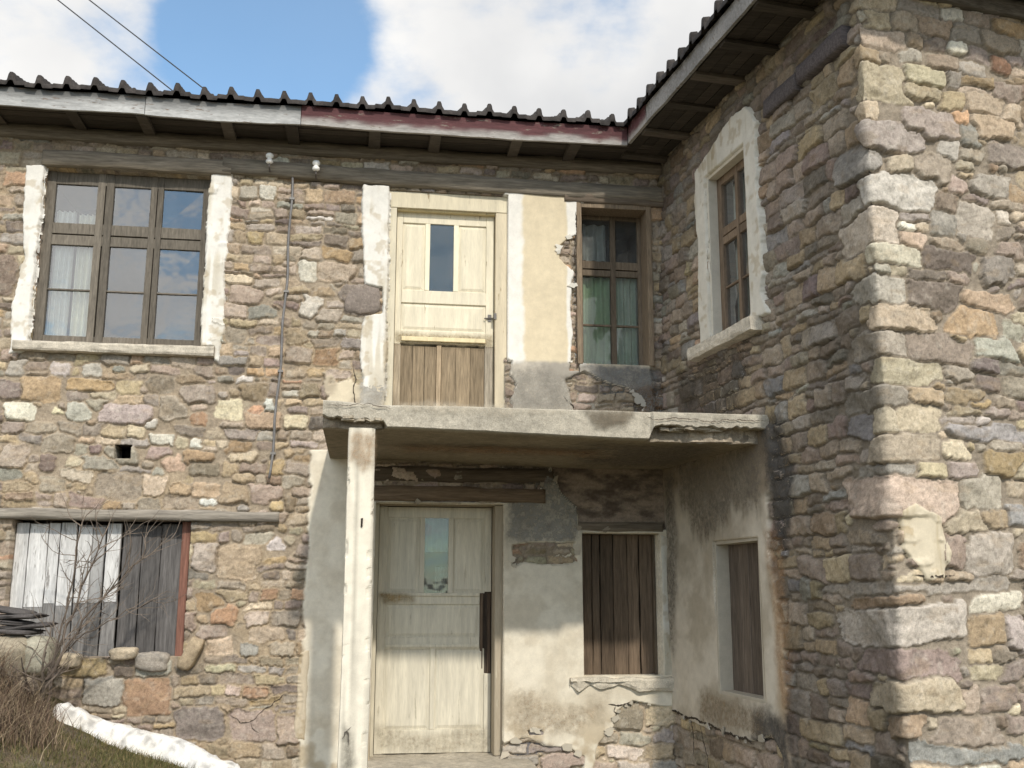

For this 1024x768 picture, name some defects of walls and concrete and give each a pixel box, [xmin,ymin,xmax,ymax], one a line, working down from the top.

spalling [555,234,646,412]
damp [488,366,663,427]
spalling [374,460,666,568]
damp [666,420,794,639]
spalling [500,701,784,768]